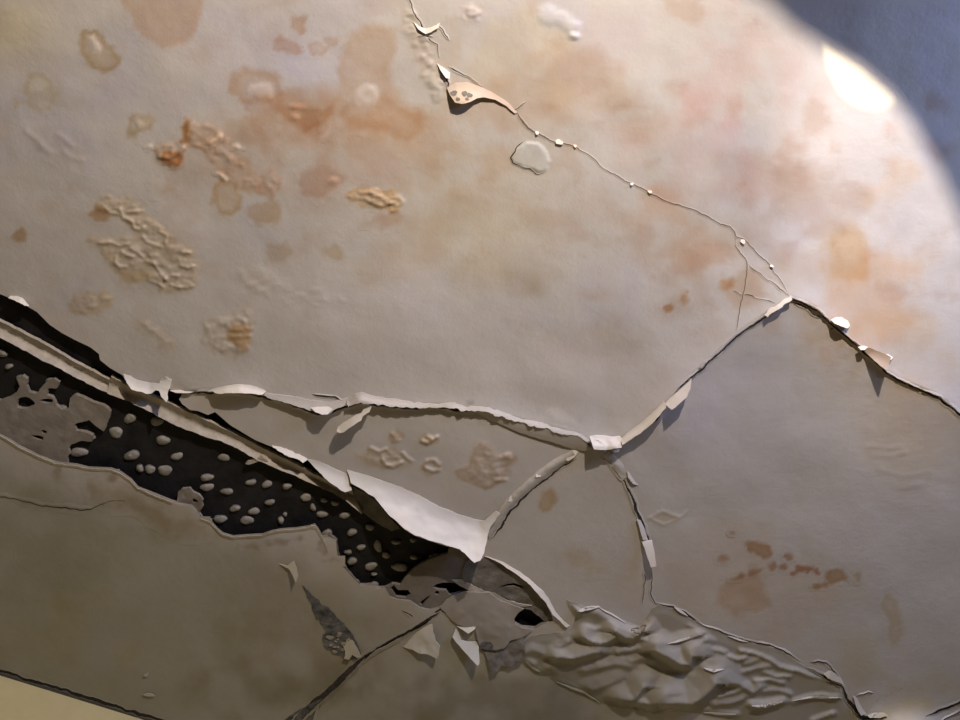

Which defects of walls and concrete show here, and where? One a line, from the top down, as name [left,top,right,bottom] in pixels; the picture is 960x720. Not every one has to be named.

leakage [115,0,207,52]
leakage [223,11,439,147]
peeling [407,0,527,113]
leakage [292,158,352,206]
peeling [509,140,543,176]
crack [184,111,960,541]
leakage [712,261,774,313]
spalling [0,294,862,720]
corrosion [708,528,863,625]
crack [285,607,447,720]
crack [806,659,888,720]
crack [926,699,960,720]